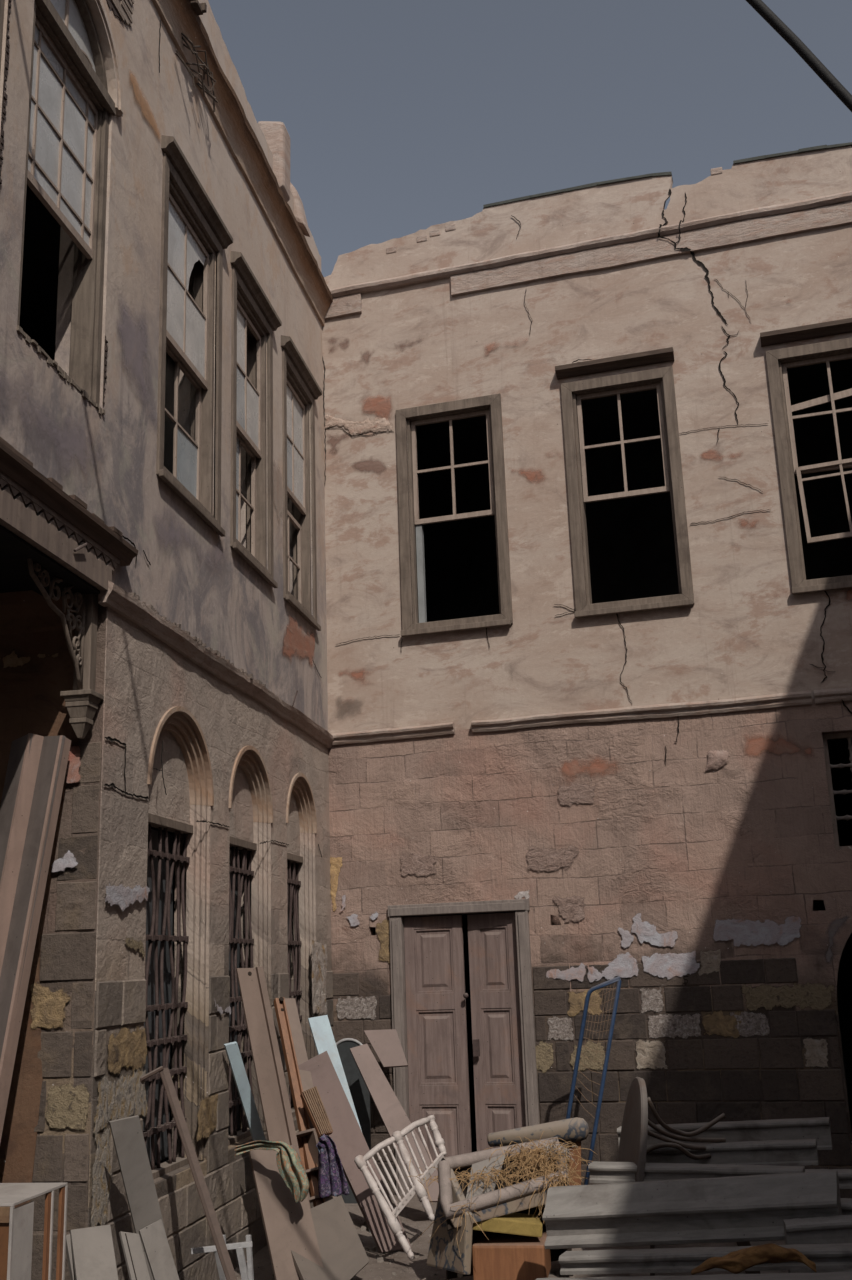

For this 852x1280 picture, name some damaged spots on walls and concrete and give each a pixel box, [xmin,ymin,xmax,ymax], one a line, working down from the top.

crack [658,189,767,442]
crack [616,614,632,702]
crack [811,591,852,714]
spalling [30,983,71,1029]
spalling [535,913,834,1073]
spalling [45,1027,148,1227]